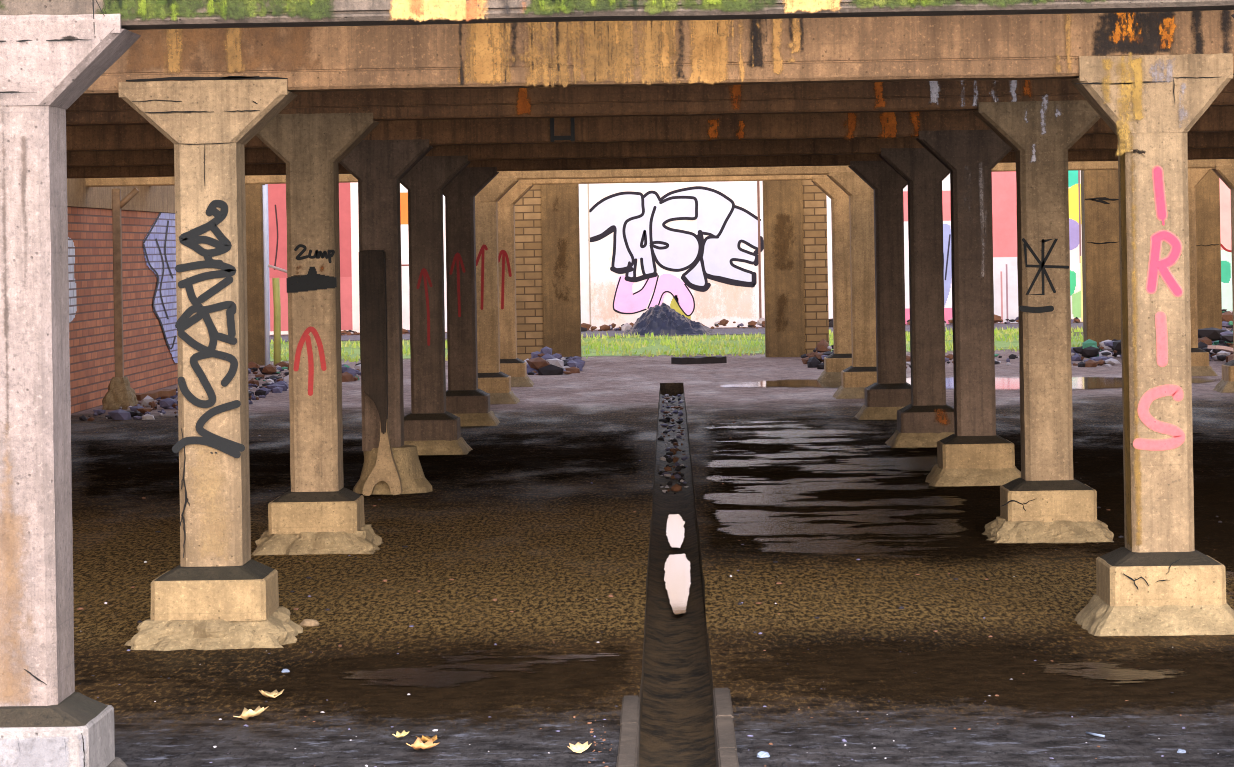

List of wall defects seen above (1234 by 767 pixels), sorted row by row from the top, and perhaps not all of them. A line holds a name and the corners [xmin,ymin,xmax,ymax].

corrosion [390,0,486,21]
water stain [458,0,804,87]
corrosion [785,0,841,13]
corrosion [1109,12,1141,44]
corrosion [1159,16,1176,49]
water stain [1191,11,1203,54]
water stain [1221,10,1232,53]
water stain [706,12,1187,561]
crack [180,428,190,558]
water stain [1193,433,1234,582]
crack [1123,559,1180,589]
water stain [730,638,1234,716]